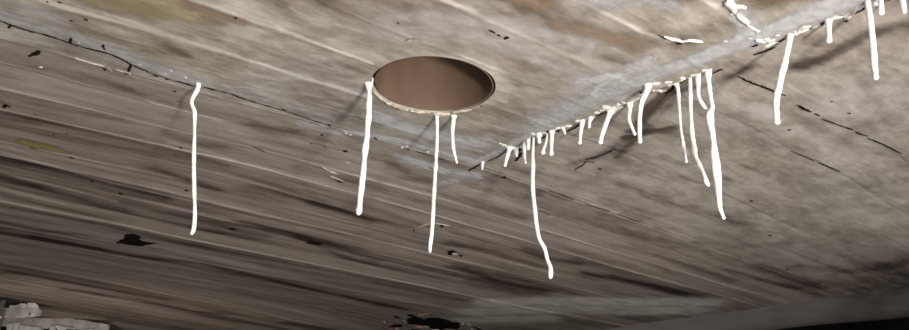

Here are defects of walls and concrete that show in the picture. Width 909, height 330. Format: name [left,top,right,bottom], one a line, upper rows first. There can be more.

leakage [0,7,216,88]
crack [0,21,331,127]
crack [469,91,643,171]
leakage [261,0,878,185]
crack [712,69,902,154]
spalling [382,314,482,330]